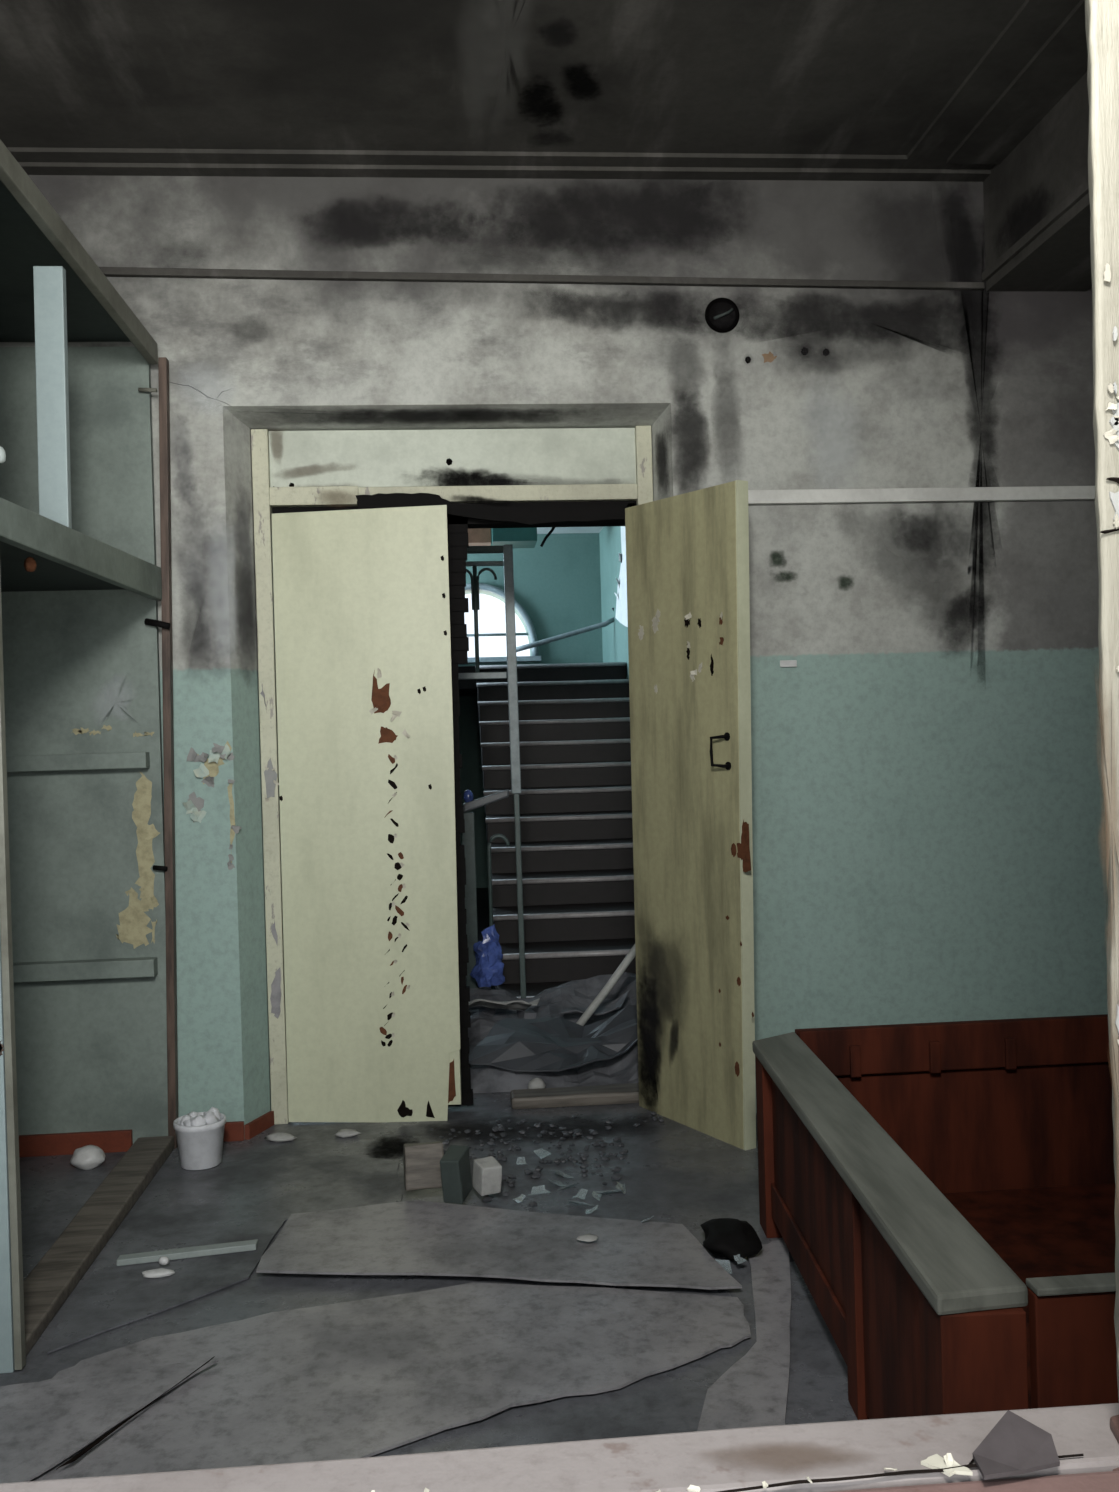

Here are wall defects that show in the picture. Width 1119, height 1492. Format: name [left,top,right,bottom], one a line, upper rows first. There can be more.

damp [945,195,974,304]
peeling [1103,381,1119,450]
damp [434,470,519,504]
peeling [1109,491,1119,529]
damp [949,594,983,635]
peeling [183,741,241,870]
crack [1058,1452,1084,1460]
crack [717,1464,977,1492]